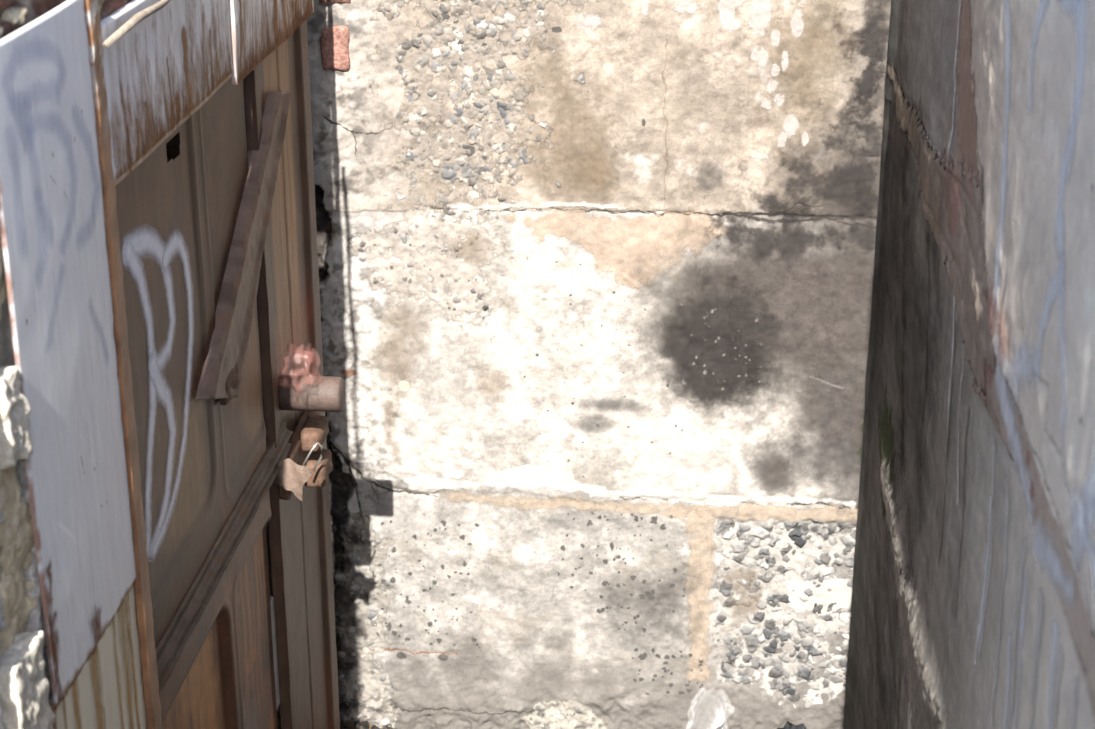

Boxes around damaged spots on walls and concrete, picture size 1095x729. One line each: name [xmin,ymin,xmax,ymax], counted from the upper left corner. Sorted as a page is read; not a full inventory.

corrosion [112,0,313,180]
spalling [315,185,331,281]
spalling [345,0,727,326]
crack [414,202,877,229]
peeling [718,0,804,109]
damp [663,0,889,489]
peeling [777,116,809,147]
crack [742,501,858,509]
corrosion [46,563,140,729]